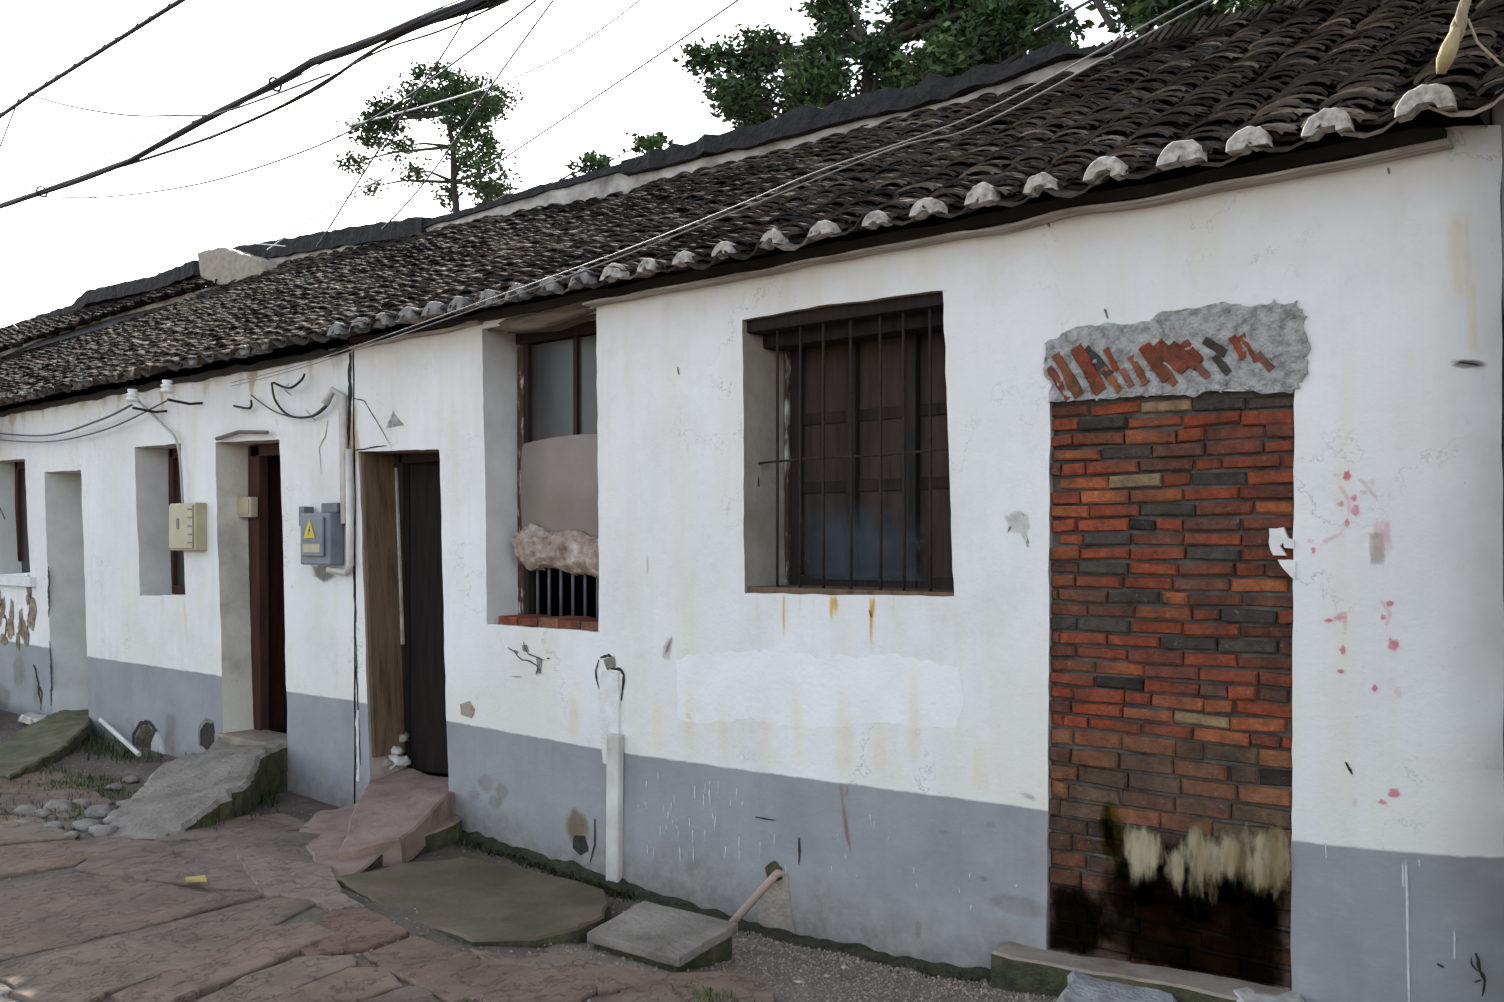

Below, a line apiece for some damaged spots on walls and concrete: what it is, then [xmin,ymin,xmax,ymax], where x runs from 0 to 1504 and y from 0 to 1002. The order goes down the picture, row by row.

peeling [0,566,50,650]
peeling [33,641,53,710]
leakage [1050,819,1283,987]